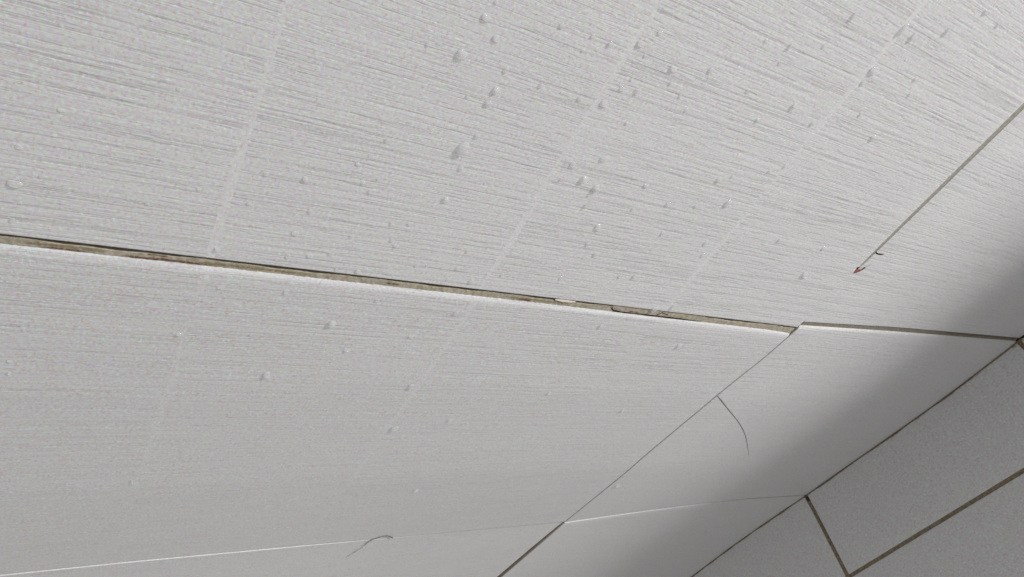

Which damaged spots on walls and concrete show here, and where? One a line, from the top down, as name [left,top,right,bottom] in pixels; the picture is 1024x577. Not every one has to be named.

crack [717,396,749,455]